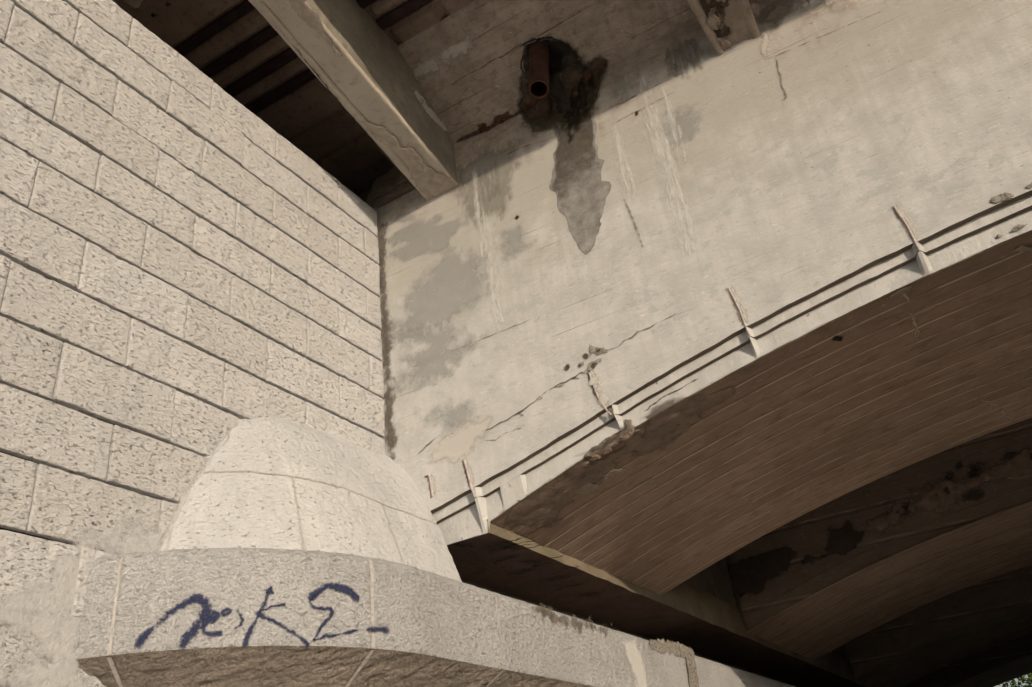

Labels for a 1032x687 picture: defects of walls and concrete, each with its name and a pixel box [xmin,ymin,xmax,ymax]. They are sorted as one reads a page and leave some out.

spalling [701,0,731,50]
leakage [749,0,809,57]
crack [768,11,881,99]
leakage [517,38,696,254]
crack [487,370,586,441]
spalling [505,345,735,535]
crack [645,379,697,411]
peeling [728,521,864,597]